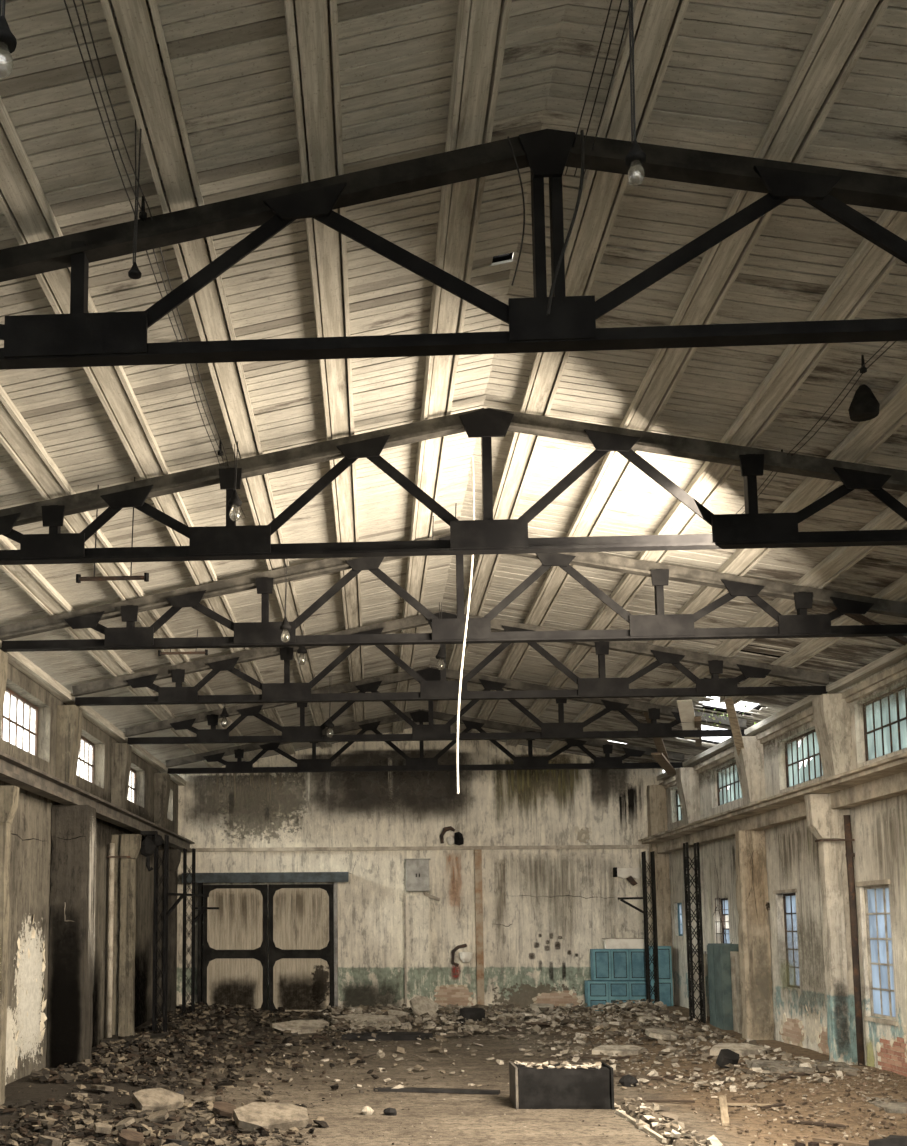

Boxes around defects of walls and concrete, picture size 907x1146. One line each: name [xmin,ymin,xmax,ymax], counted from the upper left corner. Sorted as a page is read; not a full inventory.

water stain [215,772,310,843]
peeling [15,917,47,1069]
spalling [779,1013,829,1055]
spalling [876,1025,907,1077]